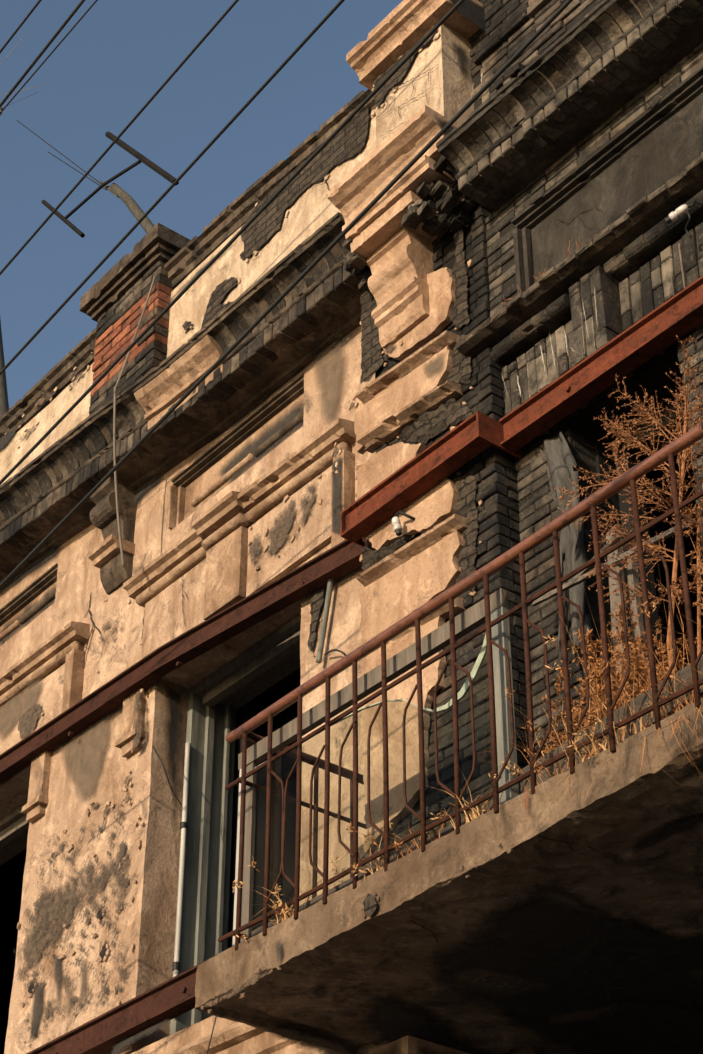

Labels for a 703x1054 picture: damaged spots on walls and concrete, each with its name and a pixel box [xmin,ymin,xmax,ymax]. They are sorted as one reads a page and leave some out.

flaking render [240,23,440,263]
spalling [401,155,478,390]
flaking render [182,277,241,333]
flaking render [343,238,404,384]
flaking render [396,398,472,444]
flaking render [359,533,414,569]
flaking render [452,472,482,596]
leakage [30,983,42,1039]
leakage [54,956,85,1012]